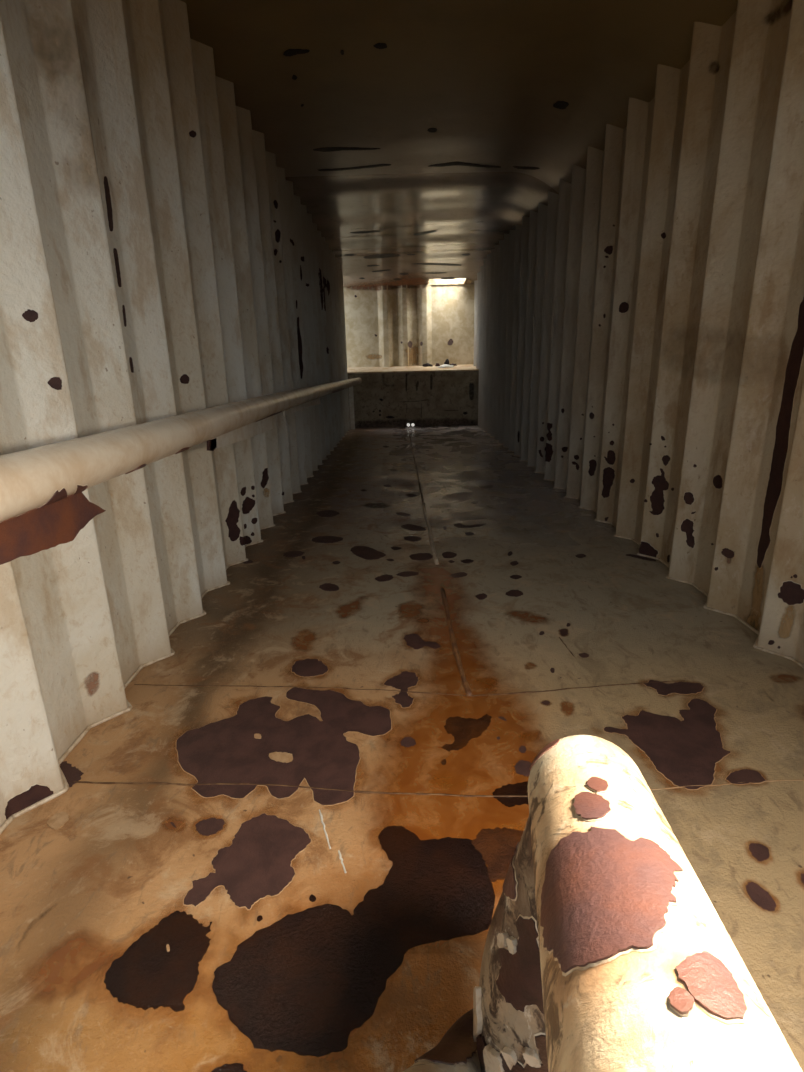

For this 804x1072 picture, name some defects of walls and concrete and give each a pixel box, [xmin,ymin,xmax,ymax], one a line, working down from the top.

rust [538,422,616,498]
rust [746,297,804,629]
rust [225,468,269,546]
rust [768,574,804,649]
rust [603,680,767,791]
rust [30,503,684,1072]
rust [747,842,770,863]
rust [745,881,778,911]
rust [668,951,748,1024]